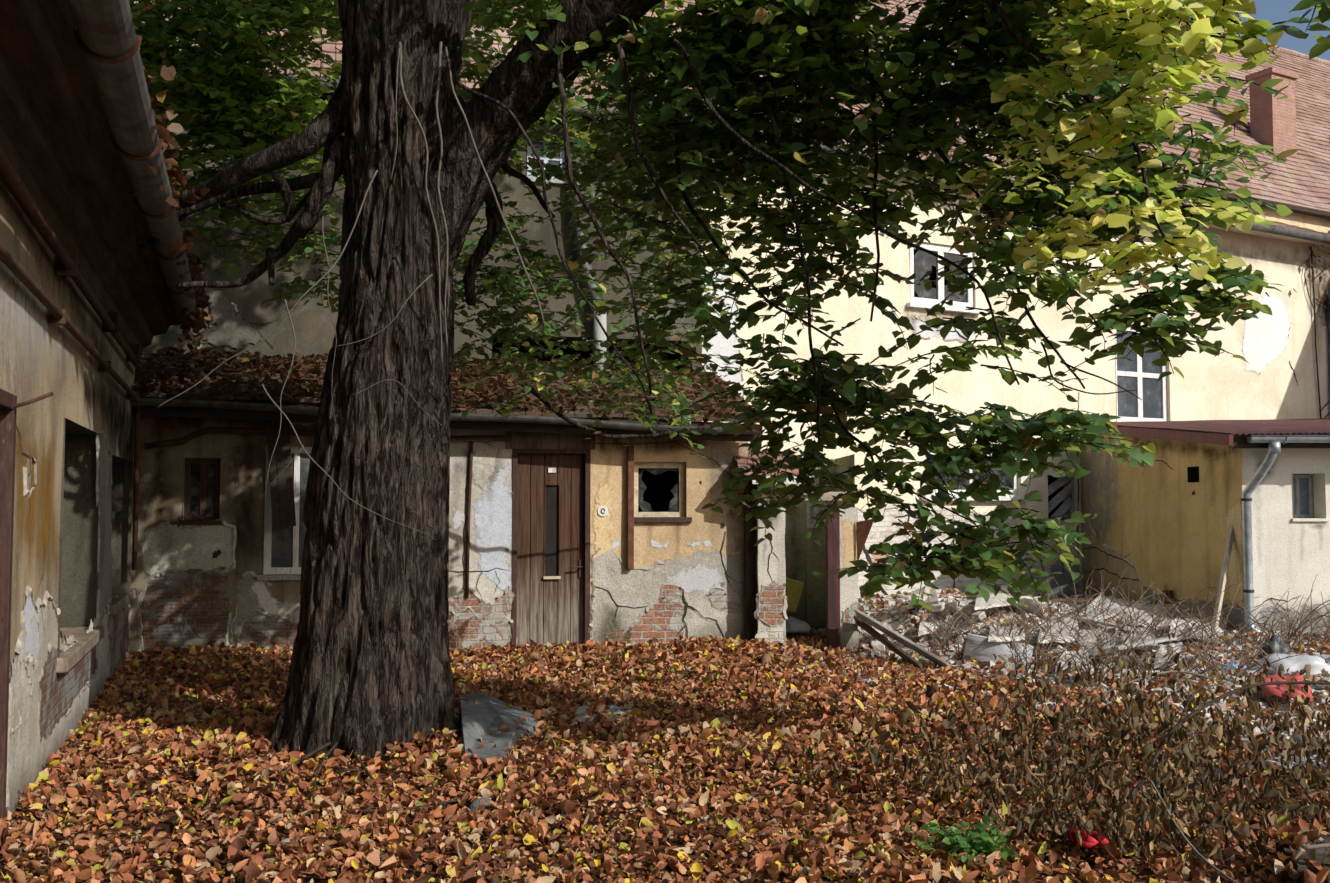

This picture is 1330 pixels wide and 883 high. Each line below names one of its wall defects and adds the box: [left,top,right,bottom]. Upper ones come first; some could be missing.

flaking render [6,429,300,822]
peeling [448,442,517,651]
crack [592,584,647,618]
flaking render [589,478,788,646]
crack [676,589,735,640]
crack [720,531,777,586]